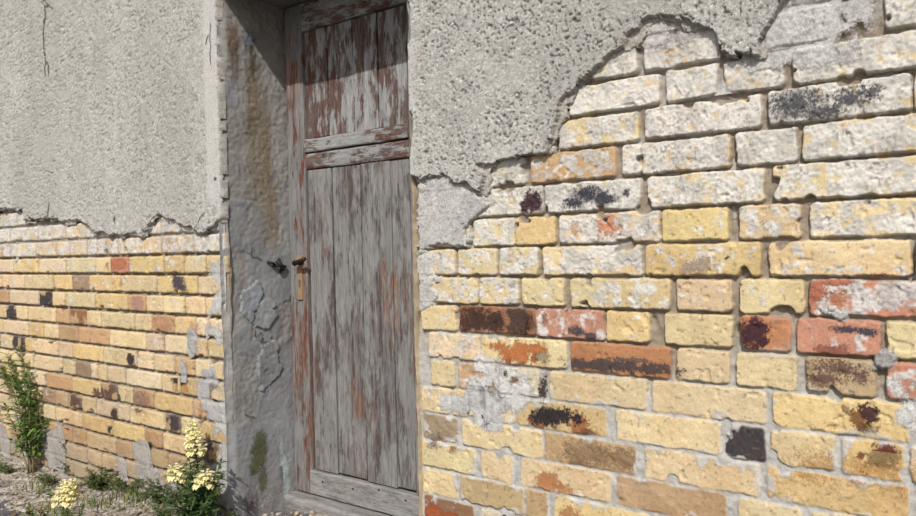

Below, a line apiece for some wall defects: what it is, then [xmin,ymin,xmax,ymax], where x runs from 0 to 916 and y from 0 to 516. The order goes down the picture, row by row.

crack [43,1,53,77]
peeling [412,0,877,311]
flaking render [0,207,225,239]
peeling [205,257,226,344]
peeling [180,345,197,384]
peeling [468,353,512,425]
peeling [132,439,151,470]
peeling [205,360,228,516]
leakage [242,431,292,516]